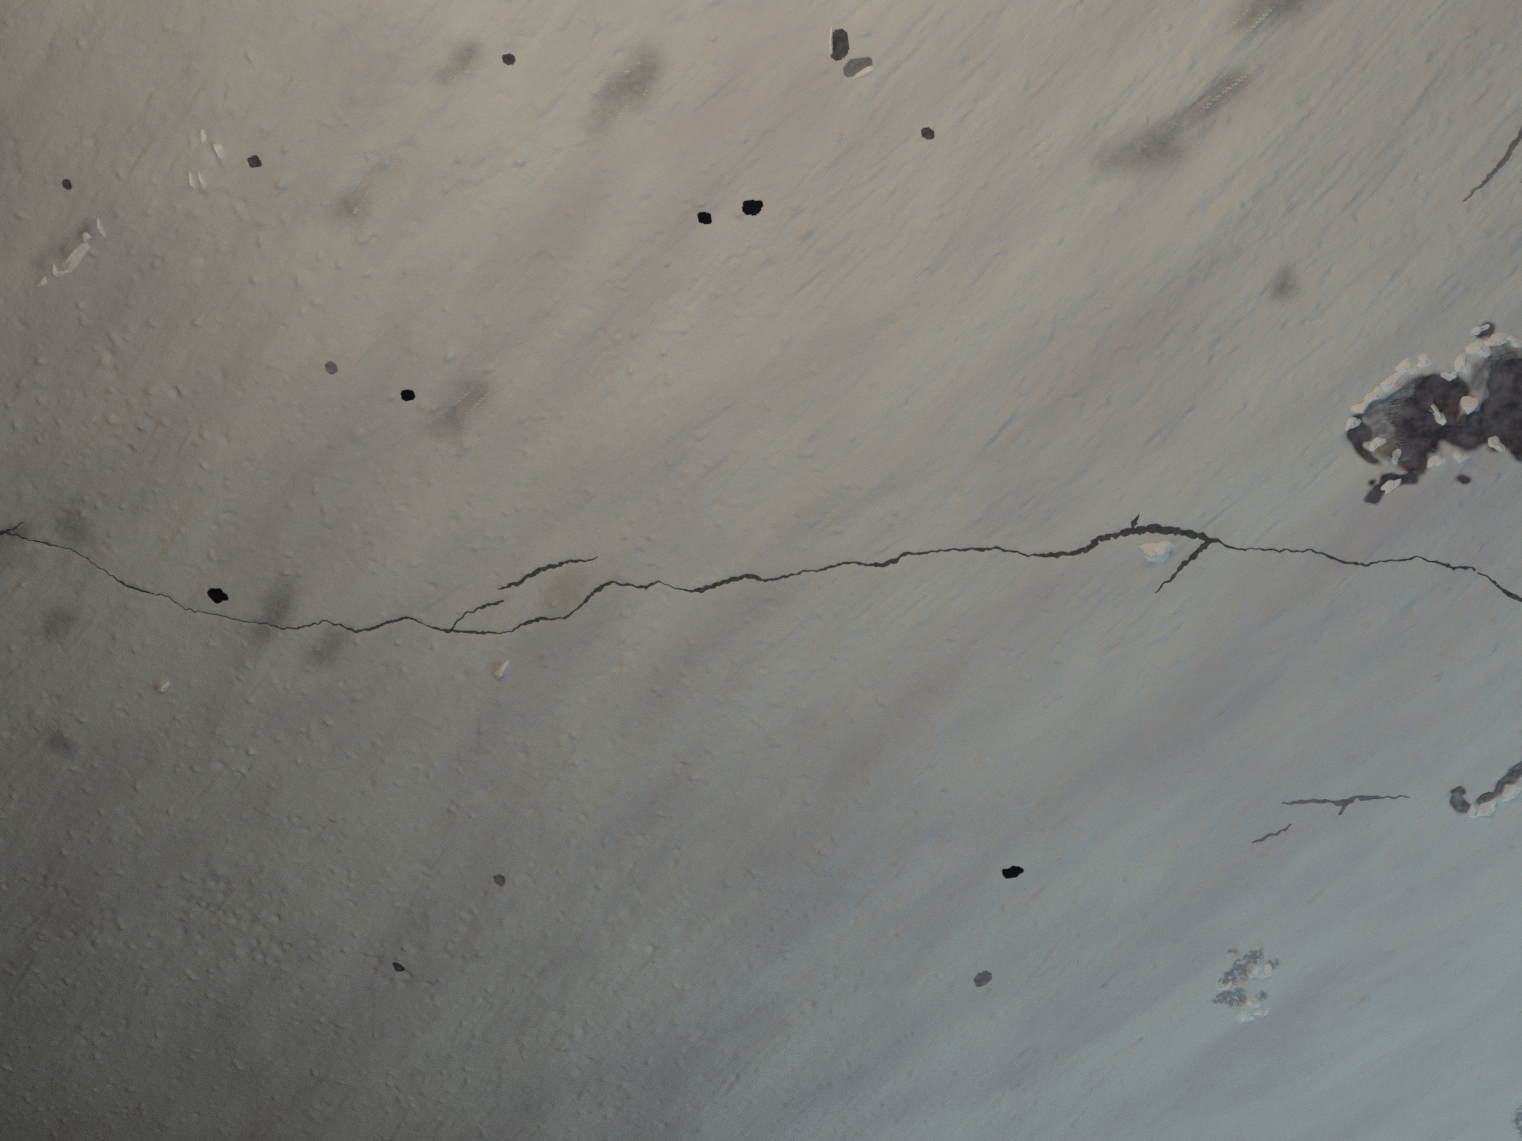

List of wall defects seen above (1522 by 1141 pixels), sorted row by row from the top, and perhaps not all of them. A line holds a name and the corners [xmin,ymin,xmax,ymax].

flaking render [1345,323,1522,504]
crack [0,515,1522,635]
flaking render [1450,762,1522,819]